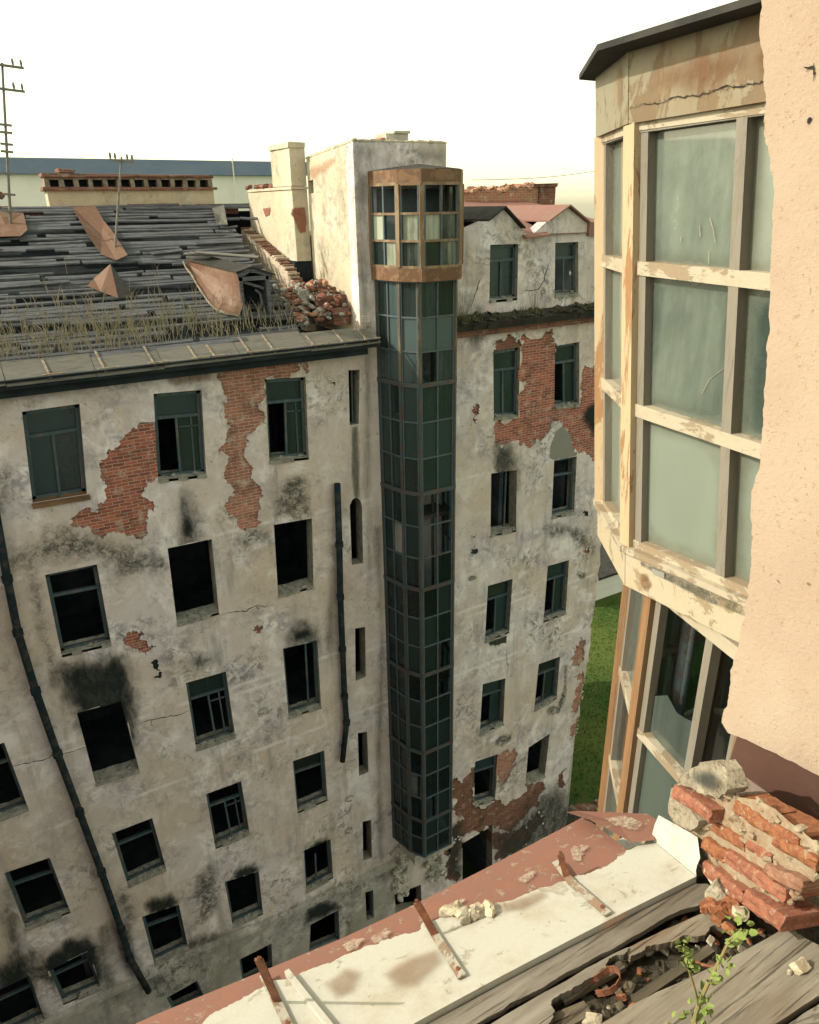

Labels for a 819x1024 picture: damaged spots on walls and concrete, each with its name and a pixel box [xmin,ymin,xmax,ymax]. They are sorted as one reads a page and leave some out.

crack [628,81,764,109]
flaking render [291,207,307,233]
flaking render [68,422,158,541]
flaking render [216,362,309,531]
leakage [279,479,307,515]
flaking render [492,329,594,461]
flaking render [121,628,164,680]
flaking render [548,635,589,740]
flaking render [444,735,571,883]